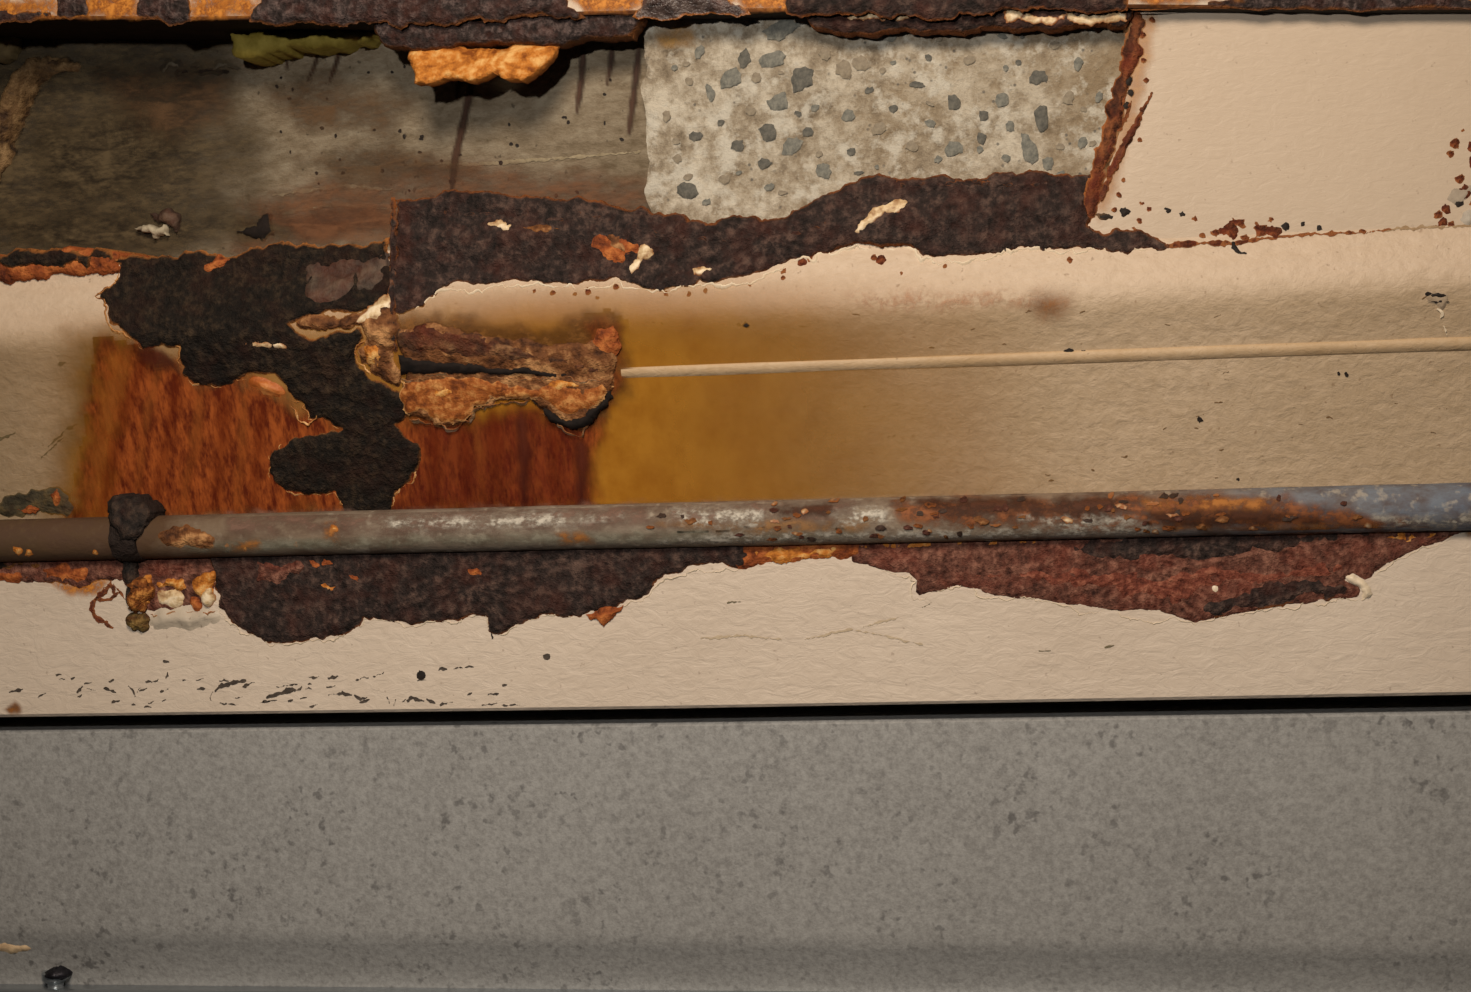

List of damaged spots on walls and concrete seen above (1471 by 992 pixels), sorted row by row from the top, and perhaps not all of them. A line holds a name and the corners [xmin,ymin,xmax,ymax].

peeling [1131,0,1471,12]
peeling [0,55,81,181]
spalling [640,18,1129,224]
peeling [356,293,627,438]
corrosion [0,0,1471,647]
peeling [123,558,216,617]